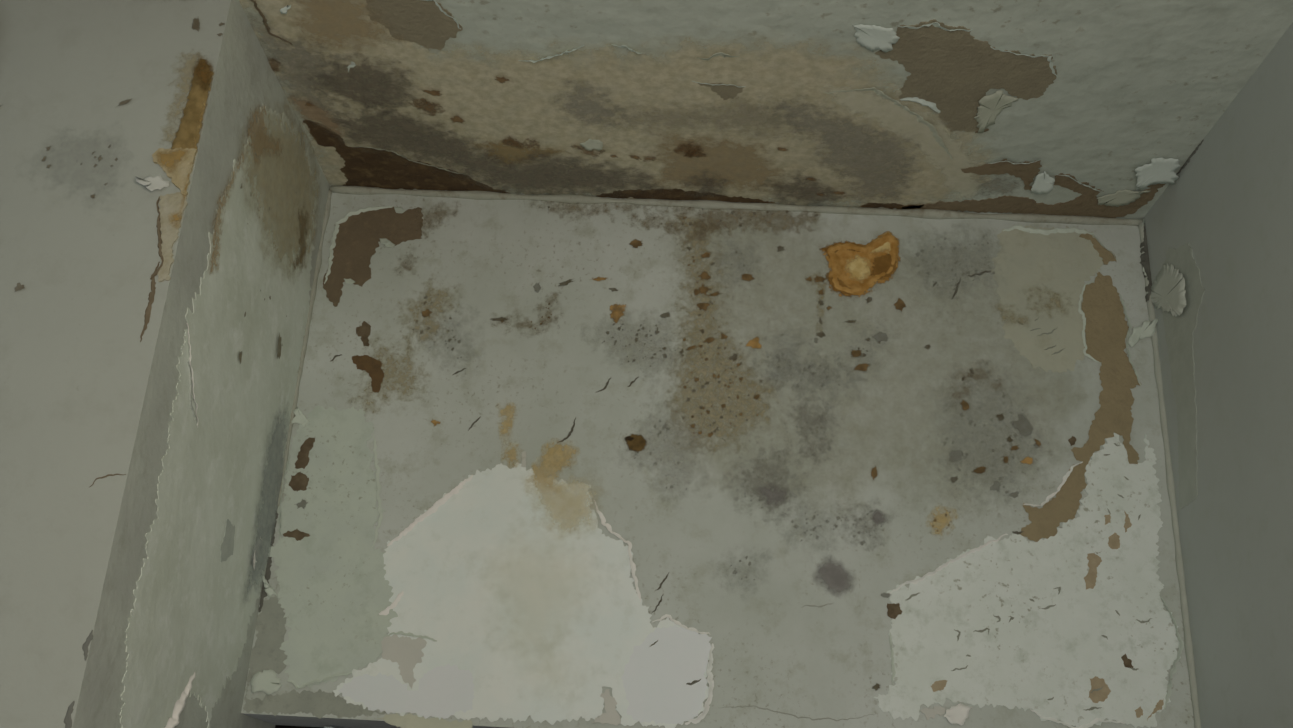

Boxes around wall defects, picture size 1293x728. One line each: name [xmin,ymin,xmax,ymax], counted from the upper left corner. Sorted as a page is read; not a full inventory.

peeling [365,0,463,50]
peeling [853,19,1058,133]
spalling [135,59,214,342]
water stain [239,0,995,456]
peeling [859,157,1181,218]
peeling [120,104,715,728]
water stain [792,510,884,545]
water stain [944,368,1041,498]
peeling [874,232,1186,728]